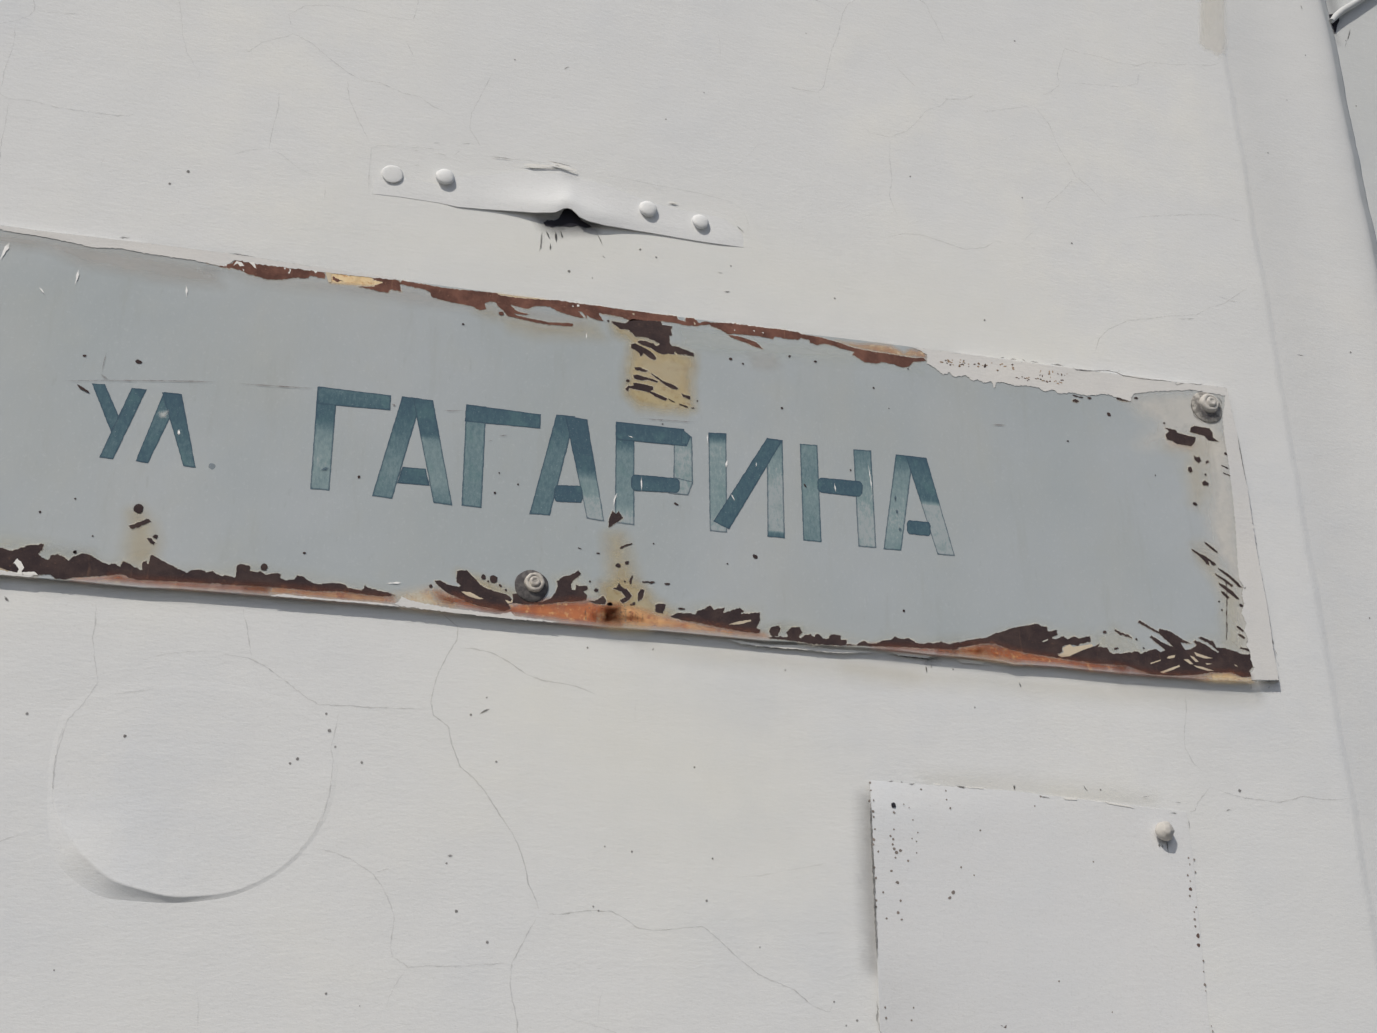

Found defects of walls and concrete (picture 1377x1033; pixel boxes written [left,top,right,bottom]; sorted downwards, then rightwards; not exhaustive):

crack [870,812,878,949]